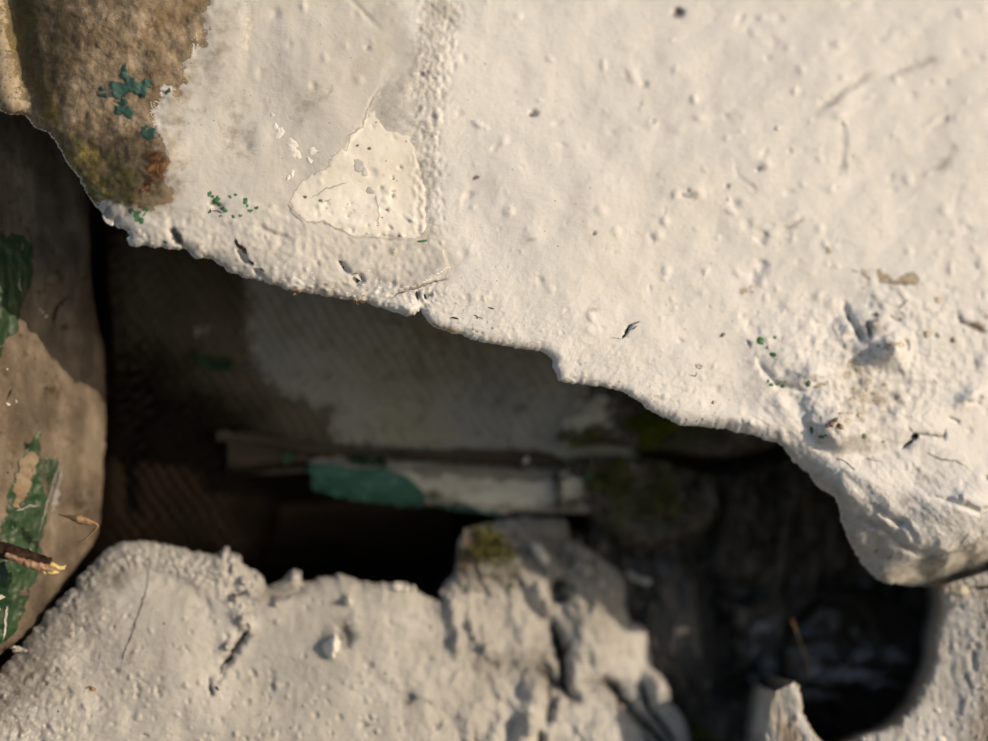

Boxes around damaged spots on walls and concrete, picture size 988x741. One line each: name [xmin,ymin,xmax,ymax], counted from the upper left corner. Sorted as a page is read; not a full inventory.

peeling [0,0,211,226]
peeling [270,84,427,243]
crack [963,583,988,613]
crack [534,618,676,741]